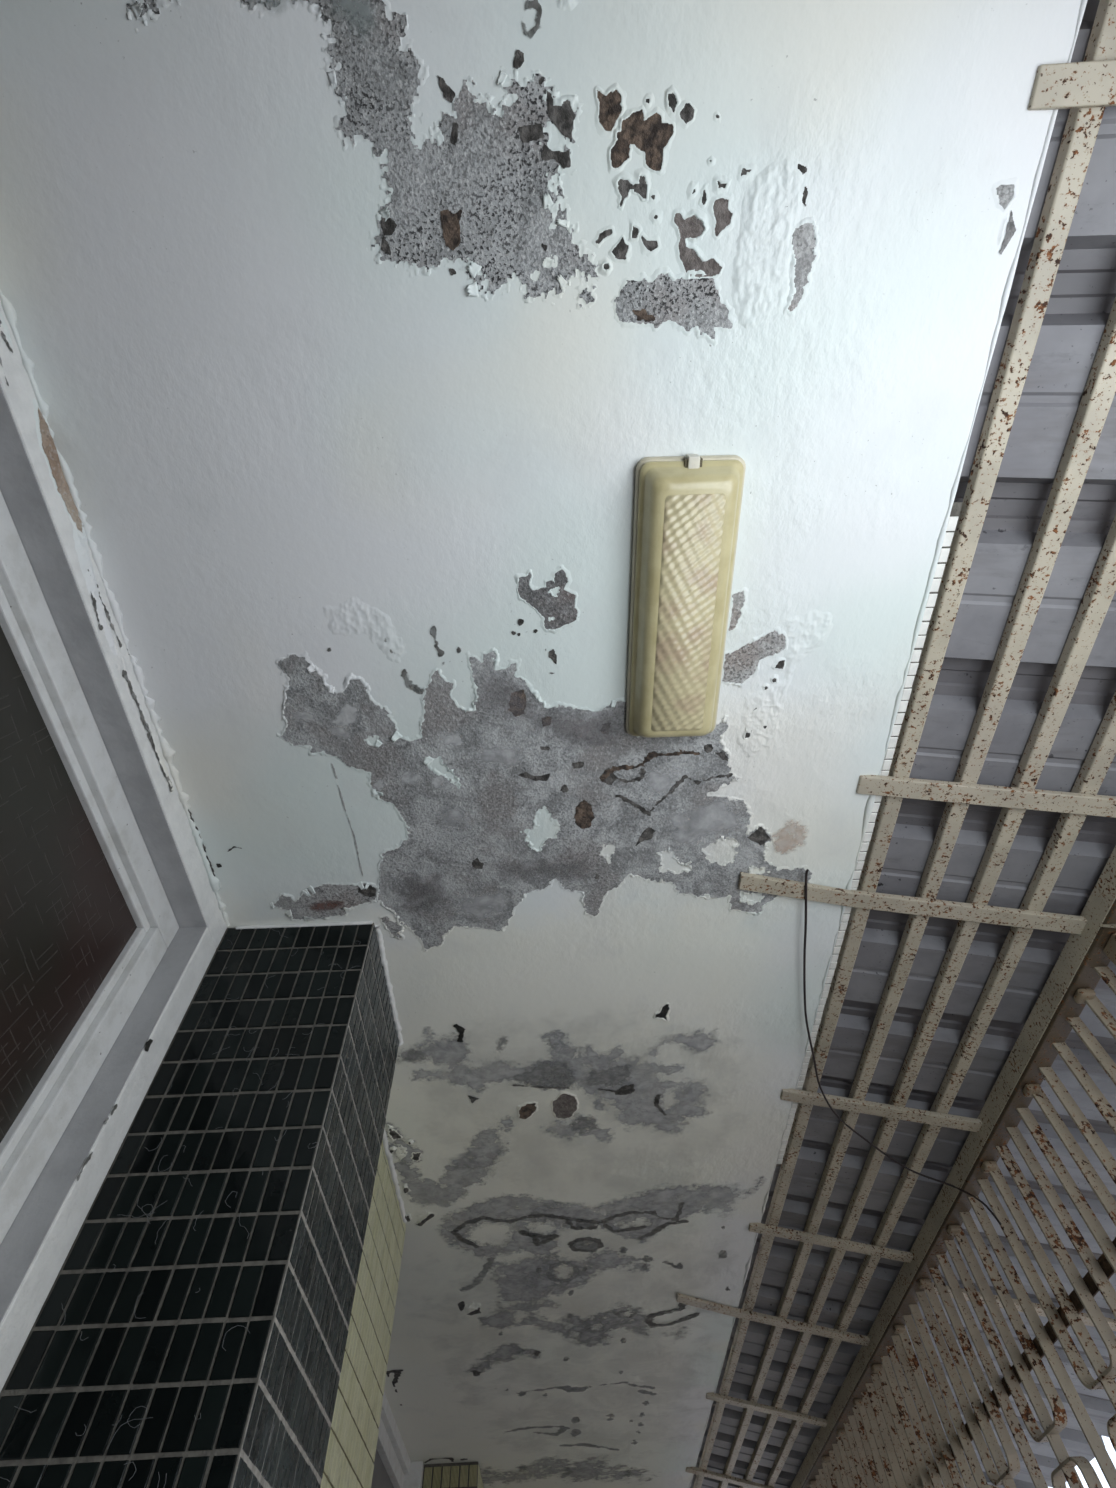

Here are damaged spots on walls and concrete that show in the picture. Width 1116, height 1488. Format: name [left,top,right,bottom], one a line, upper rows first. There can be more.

flaking render [126,0,182,34]
flaking render [226,0,759,346]
spalling [0,289,242,927]
flaking render [511,564,581,674]
flaking render [269,587,814,952]
damp [398,1024,717,1143]
damp [441,1177,763,1376]